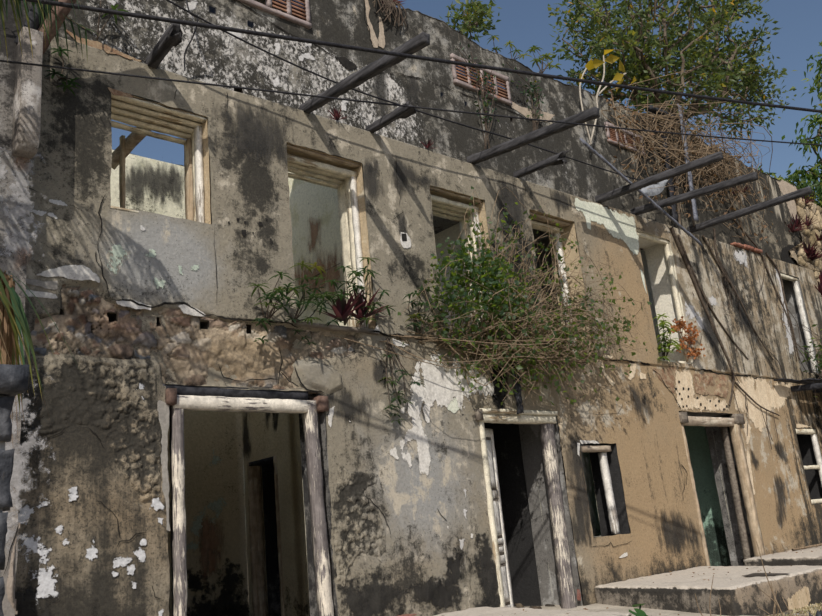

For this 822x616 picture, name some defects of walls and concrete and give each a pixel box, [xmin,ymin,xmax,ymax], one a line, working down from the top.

peeling [107,243,132,274]
crack [95,193,298,328]
peeling [574,198,639,255]
flaking render [25,265,359,389]
crack [218,347,324,393]
peeling [390,354,495,476]
peeling [628,363,792,495]
damp [15,535,58,616]
damp [85,540,98,561]
damp [112,539,147,589]
damp [331,548,463,616]
damp [474,533,504,608]